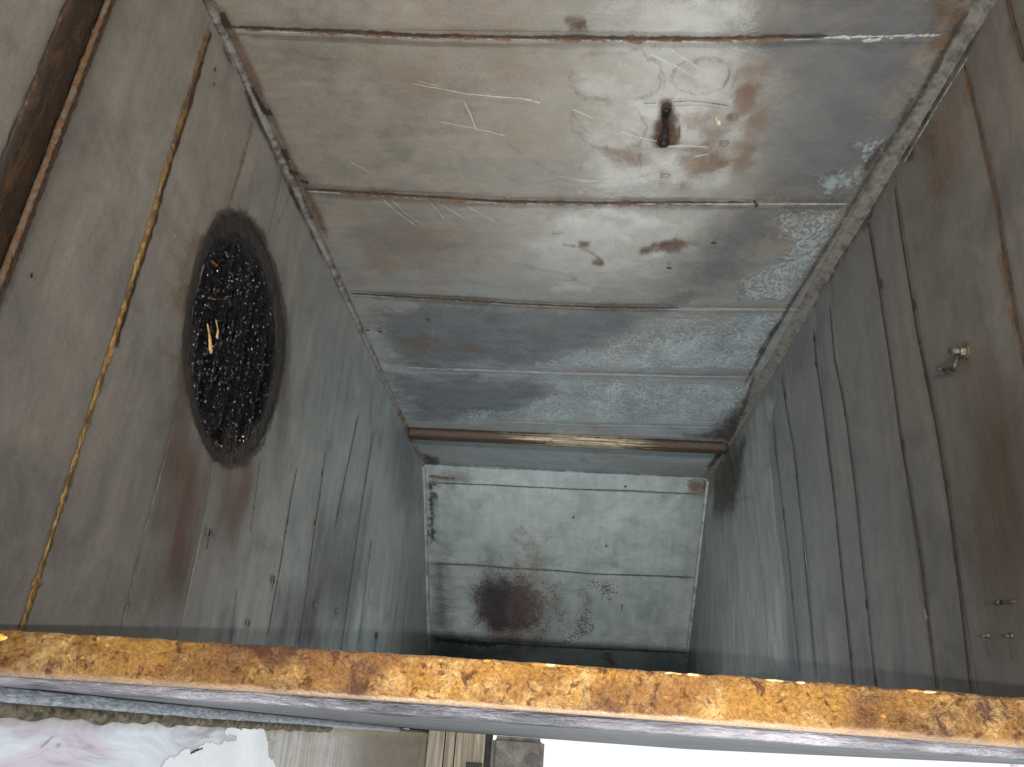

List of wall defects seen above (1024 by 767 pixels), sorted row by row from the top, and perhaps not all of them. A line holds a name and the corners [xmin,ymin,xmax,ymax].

corrosion [19,12,827,665]
corrosion [474,556,623,668]
leakage [429,0,883,679]